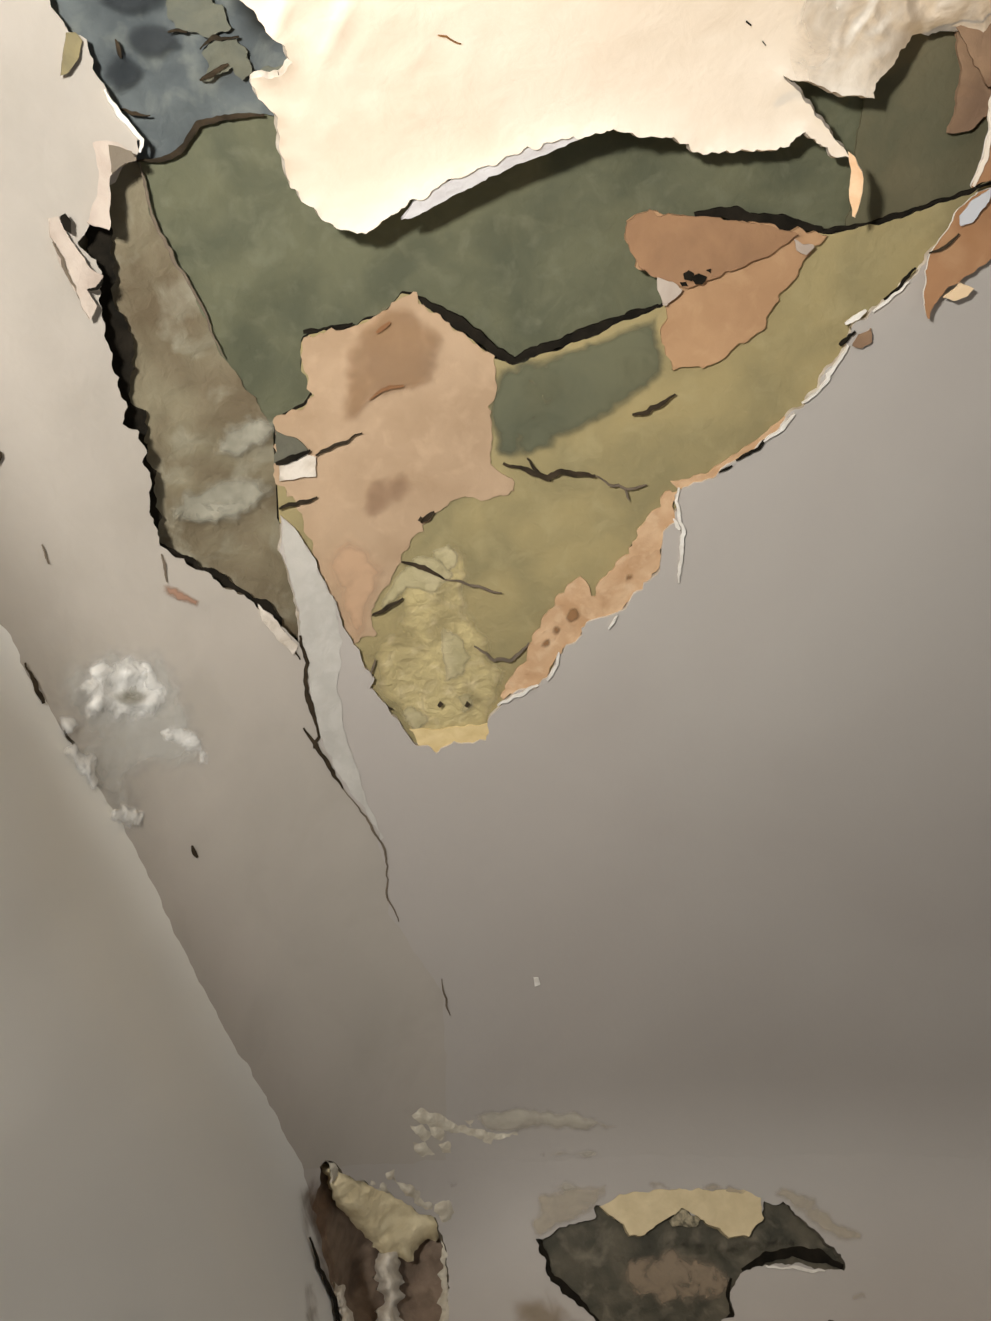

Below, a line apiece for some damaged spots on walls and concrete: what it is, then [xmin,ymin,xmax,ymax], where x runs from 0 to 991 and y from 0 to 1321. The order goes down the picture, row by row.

peeling [48,0,991,840]
efflorescence [84,659,166,716]
efflorescence [61,718,98,787]
efflorescence [163,729,202,761]
crack [279,624,399,922]
efflorescence [112,806,143,825]
crack [442,983,450,1015]
flaking render [410,1108,605,1157]
spalling [309,1160,455,1321]
spalling [534,1184,860,1321]